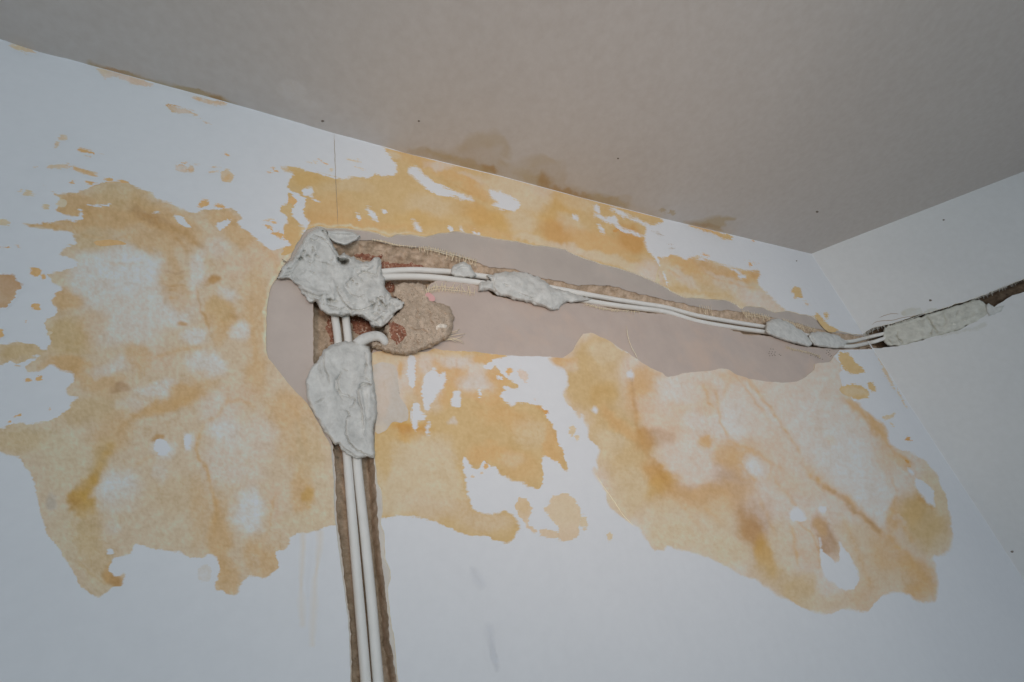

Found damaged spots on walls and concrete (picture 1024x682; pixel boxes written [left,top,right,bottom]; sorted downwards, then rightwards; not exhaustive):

leakage [0,127,838,650]
peeling [266,227,868,682]
leakage [372,333,956,617]
peeling [986,303,1004,316]